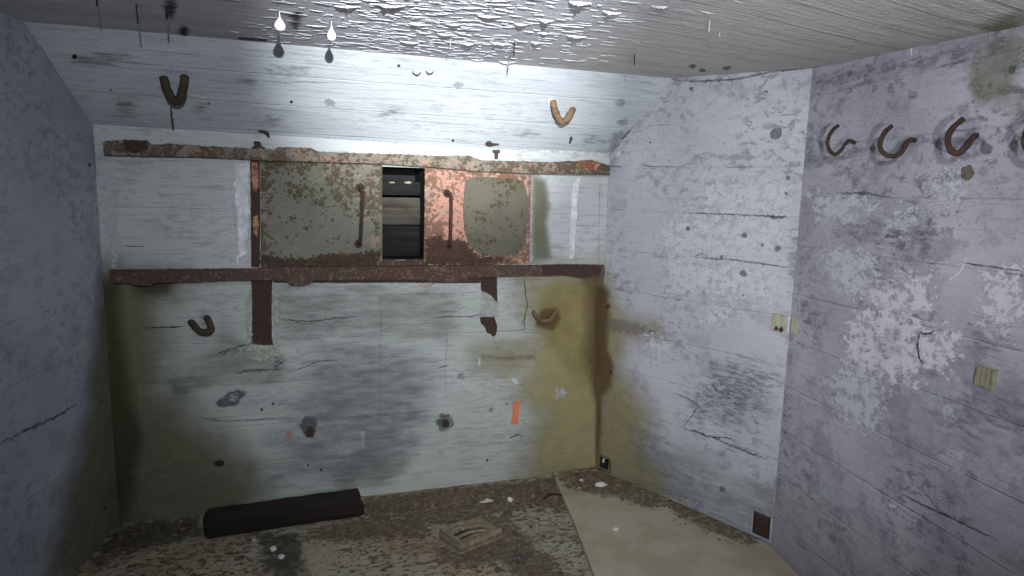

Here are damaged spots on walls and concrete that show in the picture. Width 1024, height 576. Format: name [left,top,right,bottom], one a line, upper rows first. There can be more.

peeling [230,0,714,67]
corrosion [423,232,509,265]
spalling [481,294,499,317]
crack [917,330,935,363]
leakage [493,276,660,495]
crack [672,392,768,459]